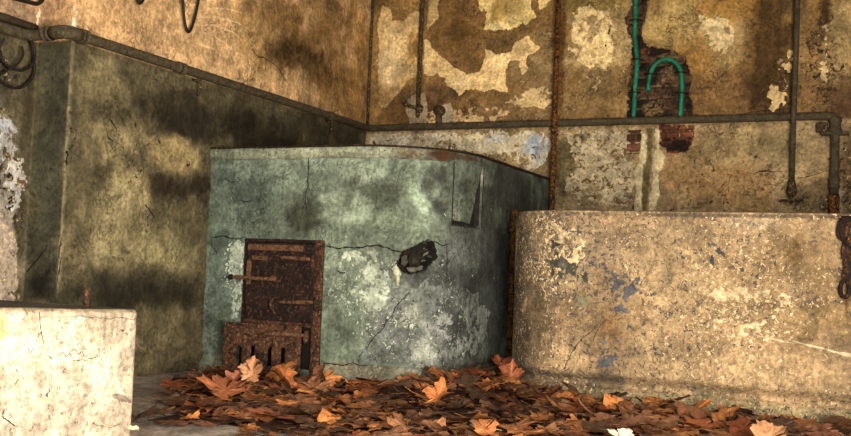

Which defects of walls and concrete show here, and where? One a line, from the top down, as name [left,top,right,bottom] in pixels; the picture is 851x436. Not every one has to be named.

peeling [370,0,552,171]
peeling [568,4,617,69]
spalling [625,0,694,154]
peeling [0,110,27,301]
crack [321,293,409,366]
crack [322,239,449,276]
peeling [325,241,490,370]
peeling [565,129,642,207]